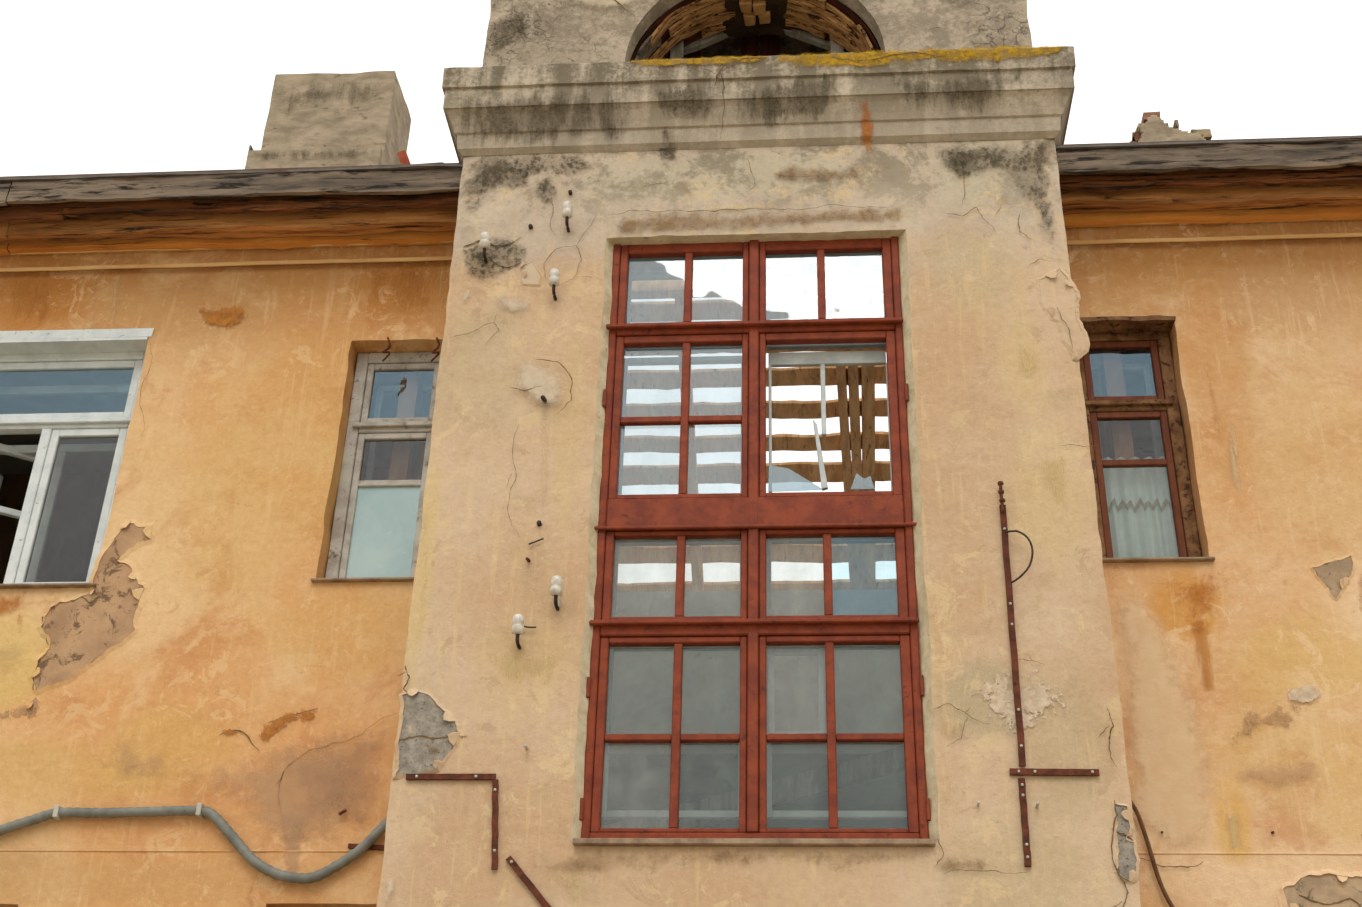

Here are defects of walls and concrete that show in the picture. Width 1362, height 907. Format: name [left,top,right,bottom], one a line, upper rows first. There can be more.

leakage [465,92,622,139]
leakage [751,77,830,123]
rust [862,105,872,149]
leakage [469,156,586,204]
leakage [941,144,1052,227]
leakage [463,237,524,278]
peeling [1036,266,1090,361]
peeling [1309,554,1362,601]
peeling [0,519,158,719]
spalling [392,688,465,780]
spalling [1111,803,1140,884]
peeling [1278,868,1362,907]